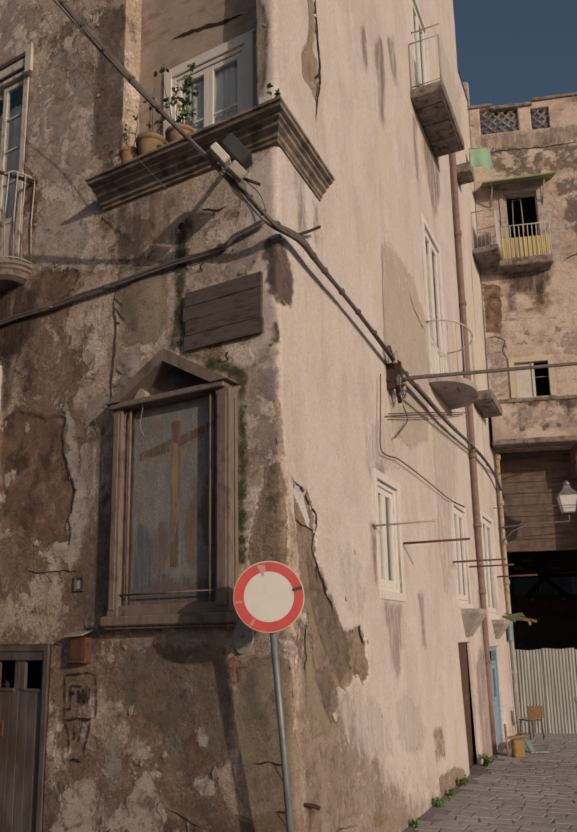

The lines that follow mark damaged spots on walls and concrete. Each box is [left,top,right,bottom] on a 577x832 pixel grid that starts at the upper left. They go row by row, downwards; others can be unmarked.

crack [174,14,243,39]
flaking render [301,0,319,101]
flaking render [262,234,294,306]
crack [109,289,130,416]
flaking render [482,283,509,391]
flaking render [0,403,92,571]
flaking render [243,323,369,723]
peeling [49,747,167,832]